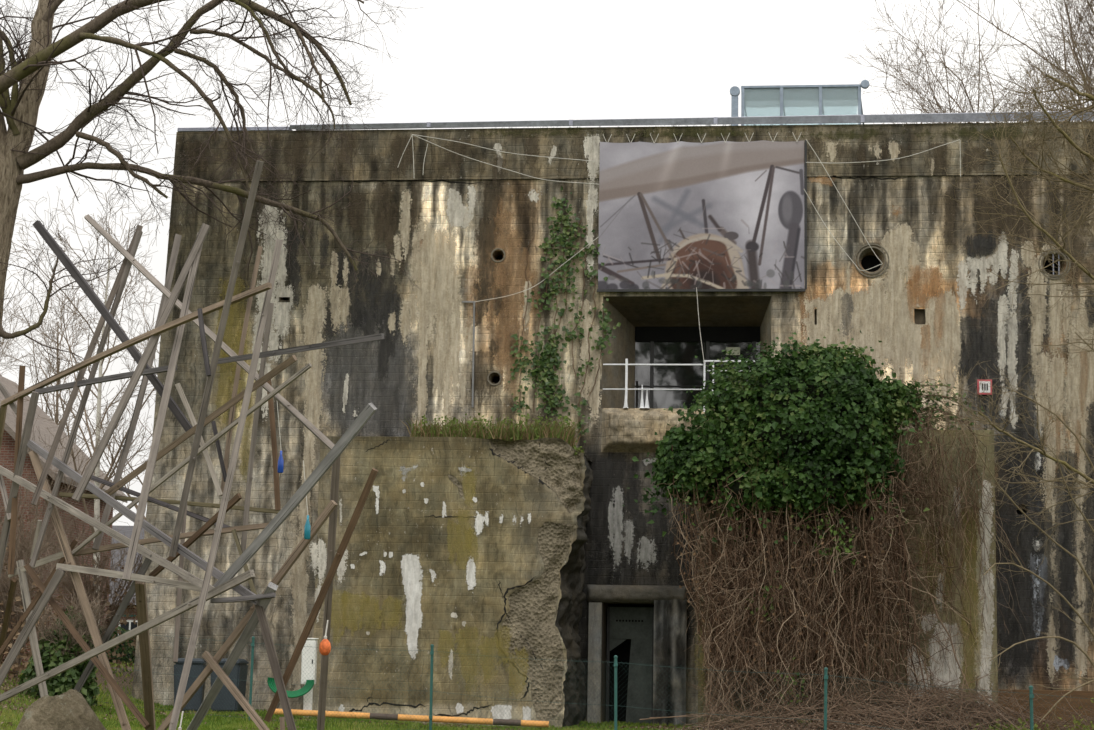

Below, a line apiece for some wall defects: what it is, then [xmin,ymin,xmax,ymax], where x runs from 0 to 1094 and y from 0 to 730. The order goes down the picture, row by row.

damp [252,124,768,706]
damp [794,123,1094,687]
peeling [309,540,367,622]
peeling [379,552,436,660]
spalling [448,441,583,726]
crack [495,576,548,702]
crack [349,697,490,718]